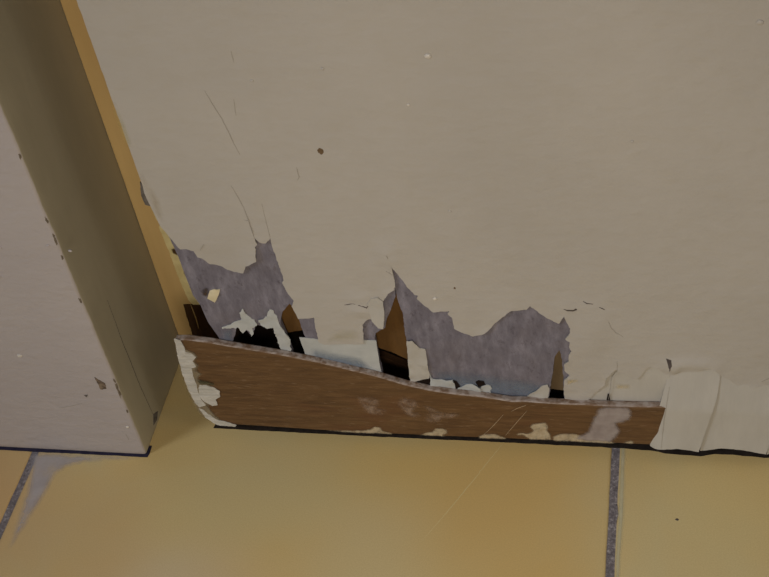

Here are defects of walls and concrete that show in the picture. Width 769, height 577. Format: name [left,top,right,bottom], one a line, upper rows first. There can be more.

peeling [174,338,236,427]
peeling [169,237,571,398]